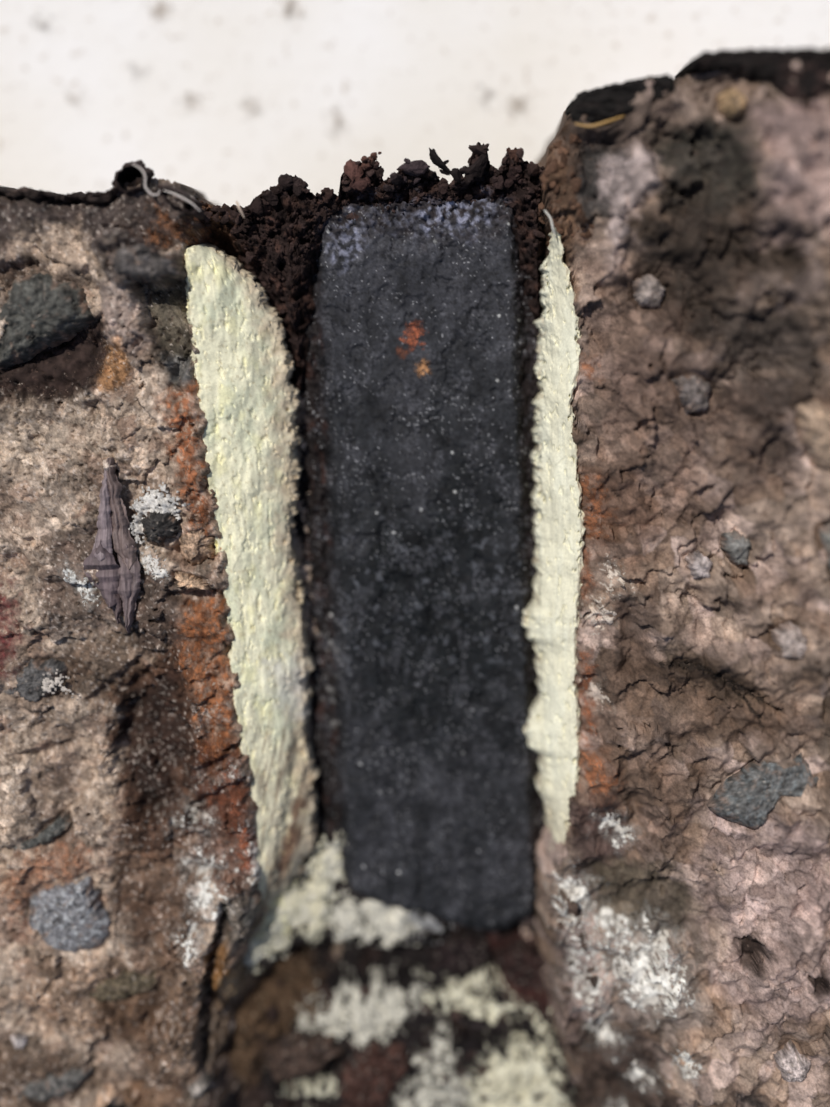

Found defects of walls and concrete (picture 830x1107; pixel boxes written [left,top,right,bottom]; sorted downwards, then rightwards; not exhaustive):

rust [147,142,546,390]
rust [167,381,221,548]
rust [179,595,253,870]
efflorescence [591,813,634,850]
crack [198,904,228,1067]
efflorescence [543,865,695,1048]
efflorescence [624,1060,670,1093]
efflorescence [670,1050,702,1080]